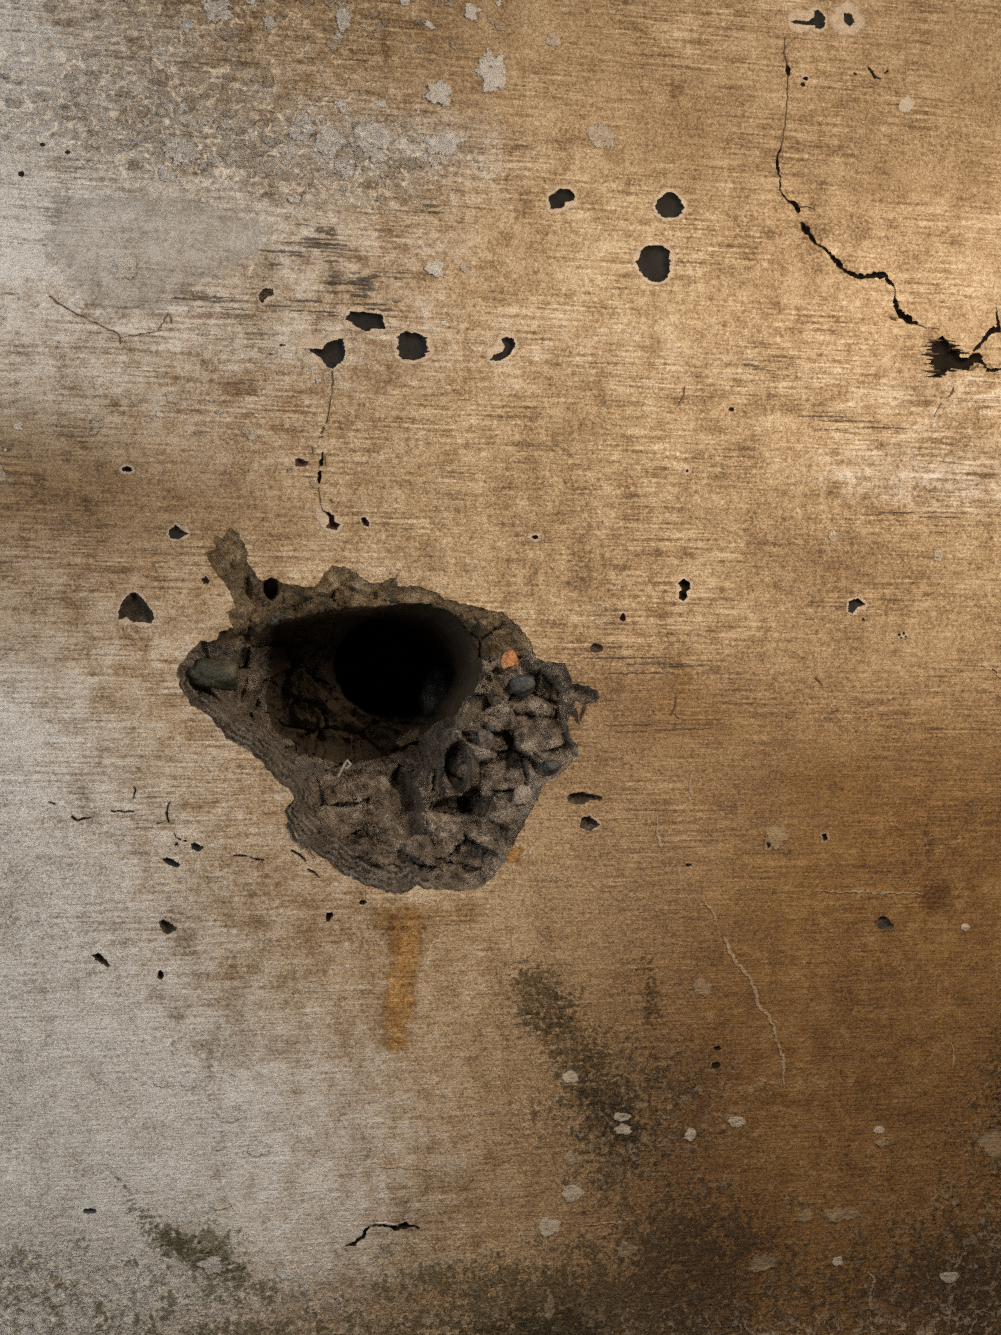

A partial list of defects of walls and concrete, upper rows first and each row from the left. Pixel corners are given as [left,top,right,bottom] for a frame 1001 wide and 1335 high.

peeling [400,0,459,29]
peeling [5,91,46,108]
peeling [61,11,439,205]
crack [776,36,1001,418]
peeling [166,522,191,542]
spalling [176,528,603,905]
corrosion [367,894,493,1053]
crack [345,1221,420,1247]
water stain [197,1256,226,1275]